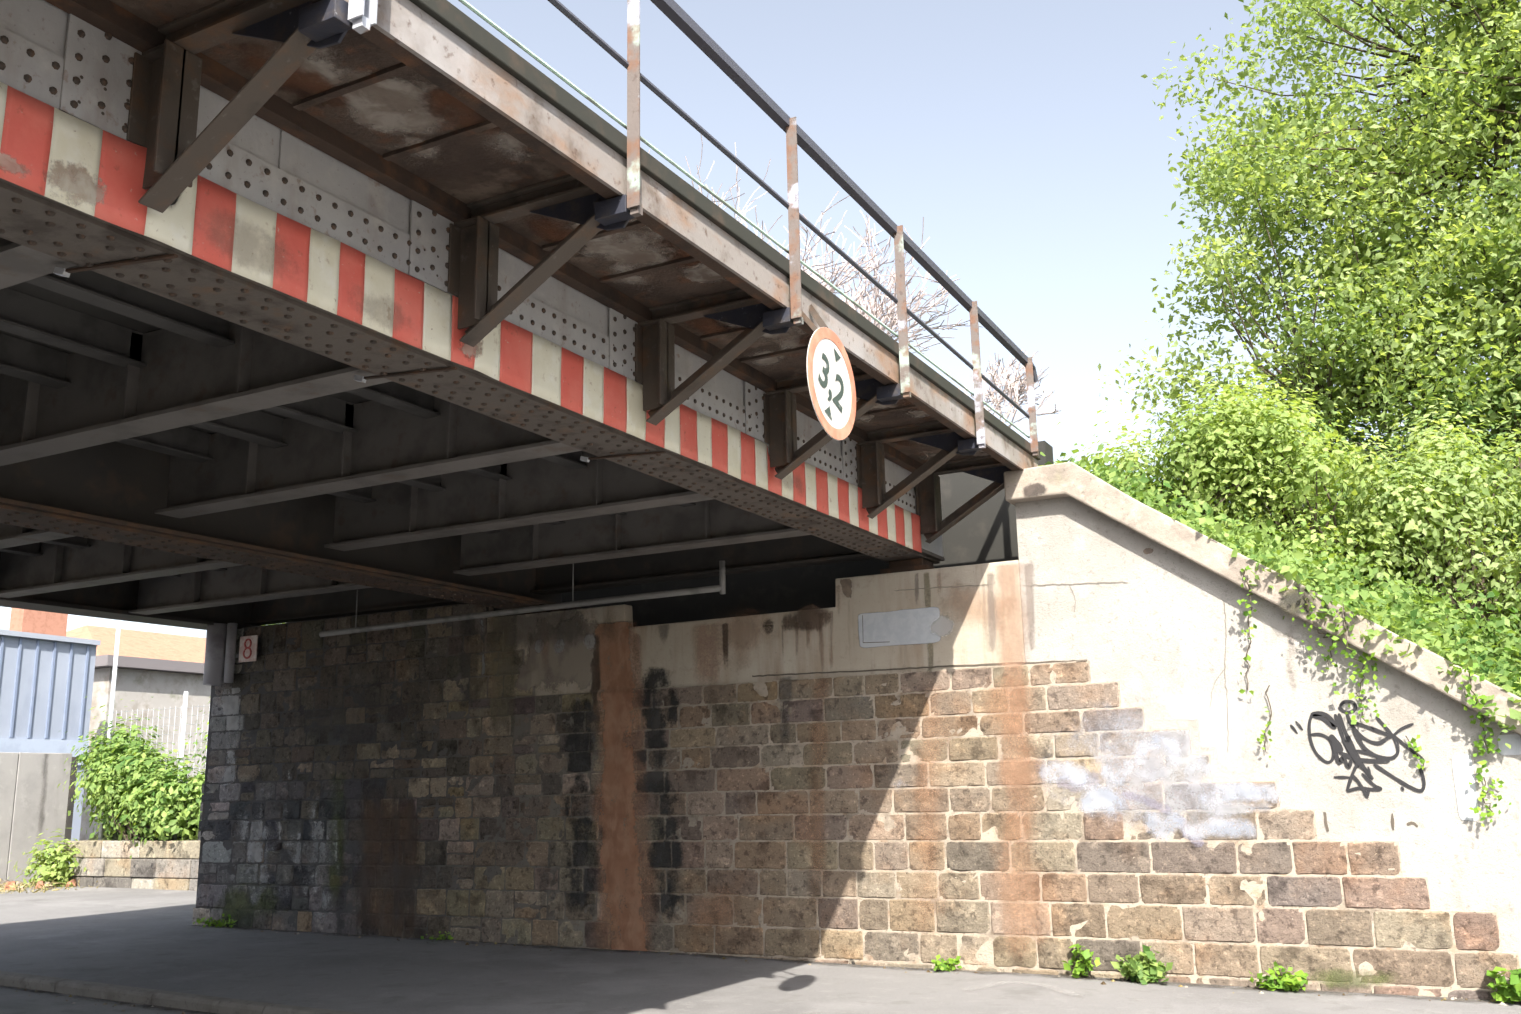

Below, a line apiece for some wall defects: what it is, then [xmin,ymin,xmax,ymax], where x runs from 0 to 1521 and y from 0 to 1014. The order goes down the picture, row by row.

corrosion [590,621,648,951]
water stain [667,689,679,723]